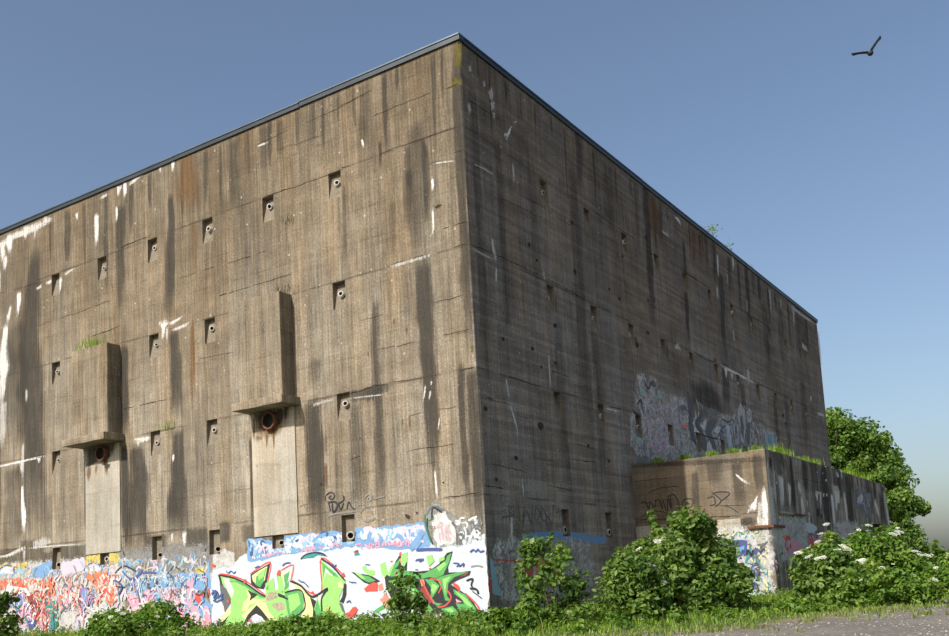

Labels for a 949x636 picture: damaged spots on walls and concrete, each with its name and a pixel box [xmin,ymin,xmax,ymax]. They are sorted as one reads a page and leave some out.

damp [379,70,398,161]
damp [0,218,49,267]
damp [0,259,72,530]
damp [416,266,440,458]
damp [741,458,853,553]
damp [873,482,890,527]